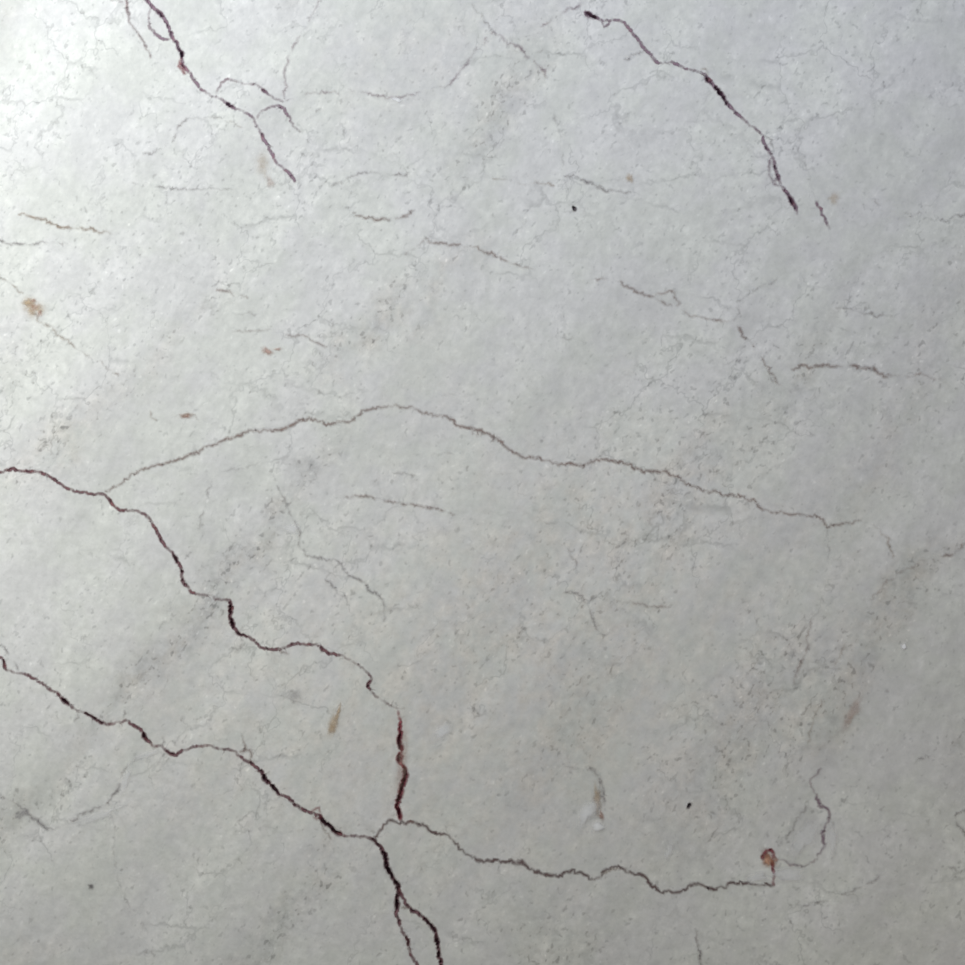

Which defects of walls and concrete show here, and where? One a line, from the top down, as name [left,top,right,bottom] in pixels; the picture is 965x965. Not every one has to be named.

crack [126,0,296,182]
crack [584,11,828,224]
crack [124,432,244,480]
crack [271,408,375,432]
crack [449,418,542,460]
crack [564,459,689,485]
crack [0,467,340,657]
crack [0,656,775,965]
crack [816,796,830,844]
rust [761,848,777,865]